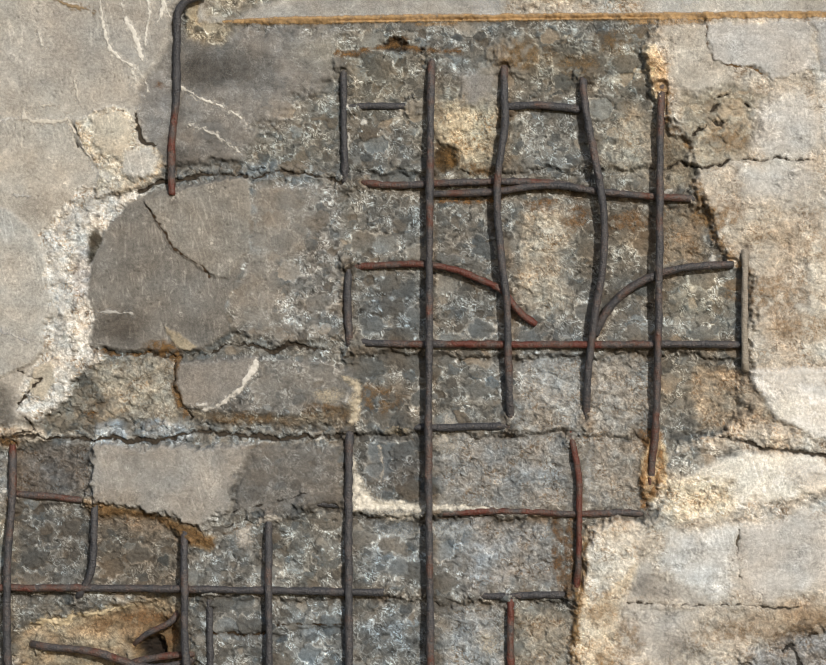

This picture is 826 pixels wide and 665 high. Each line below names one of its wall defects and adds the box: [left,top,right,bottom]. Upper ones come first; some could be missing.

crack [57,0,171,92]
corrosion [222,11,826,26]
crack [135,113,156,147]
corrosion [445,150,489,175]
crack [137,169,343,278]
spalling [648,84,826,476]
crack [0,340,357,445]
spalling [0,19,664,665]
spalling [424,58,748,665]
corrosion [639,430,665,508]
crack [696,432,826,458]
corrosion [552,517,588,663]